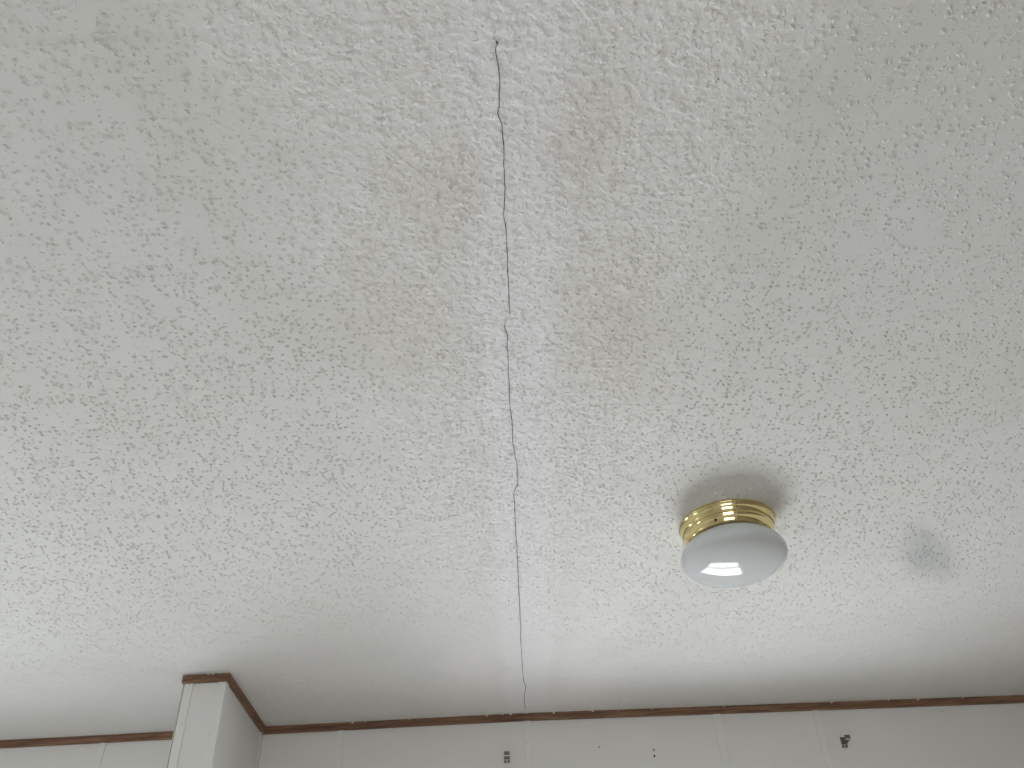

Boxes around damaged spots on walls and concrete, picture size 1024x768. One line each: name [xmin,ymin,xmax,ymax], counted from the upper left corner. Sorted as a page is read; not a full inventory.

crack [495,41,526,705]